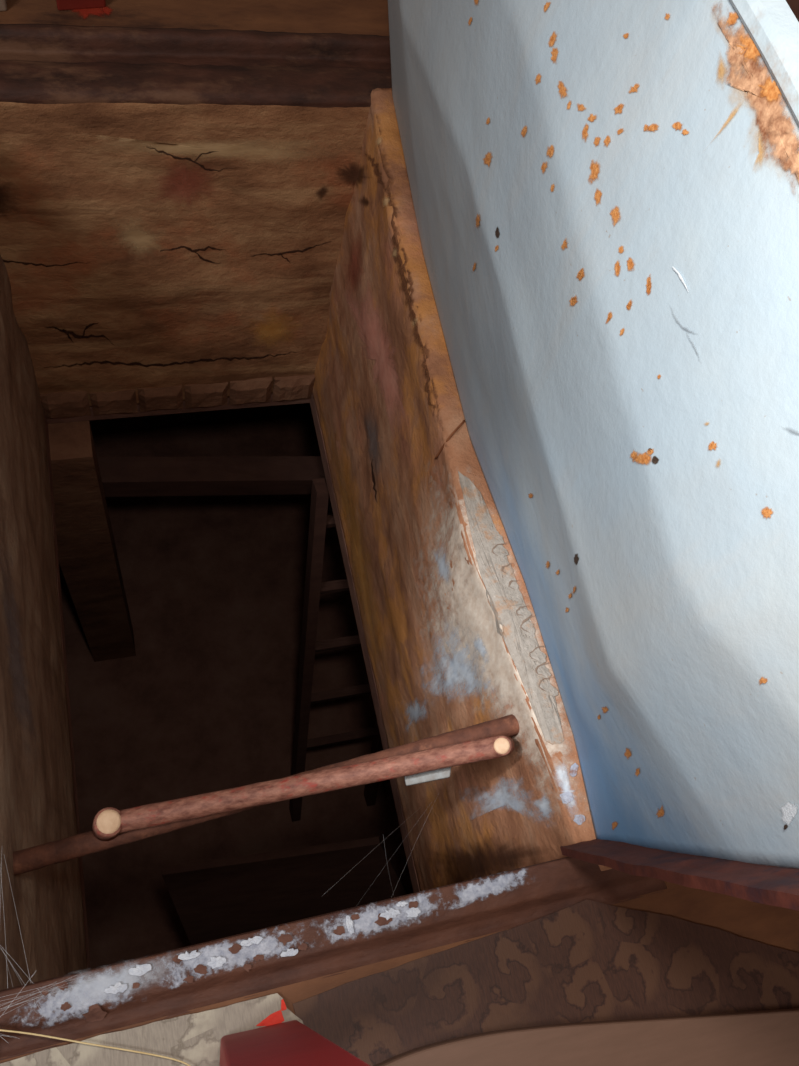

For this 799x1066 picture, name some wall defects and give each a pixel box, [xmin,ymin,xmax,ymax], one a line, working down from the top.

crack [148,147,227,172]
crack [160,246,223,264]
crack [254,241,331,262]
damp [430,501,565,763]